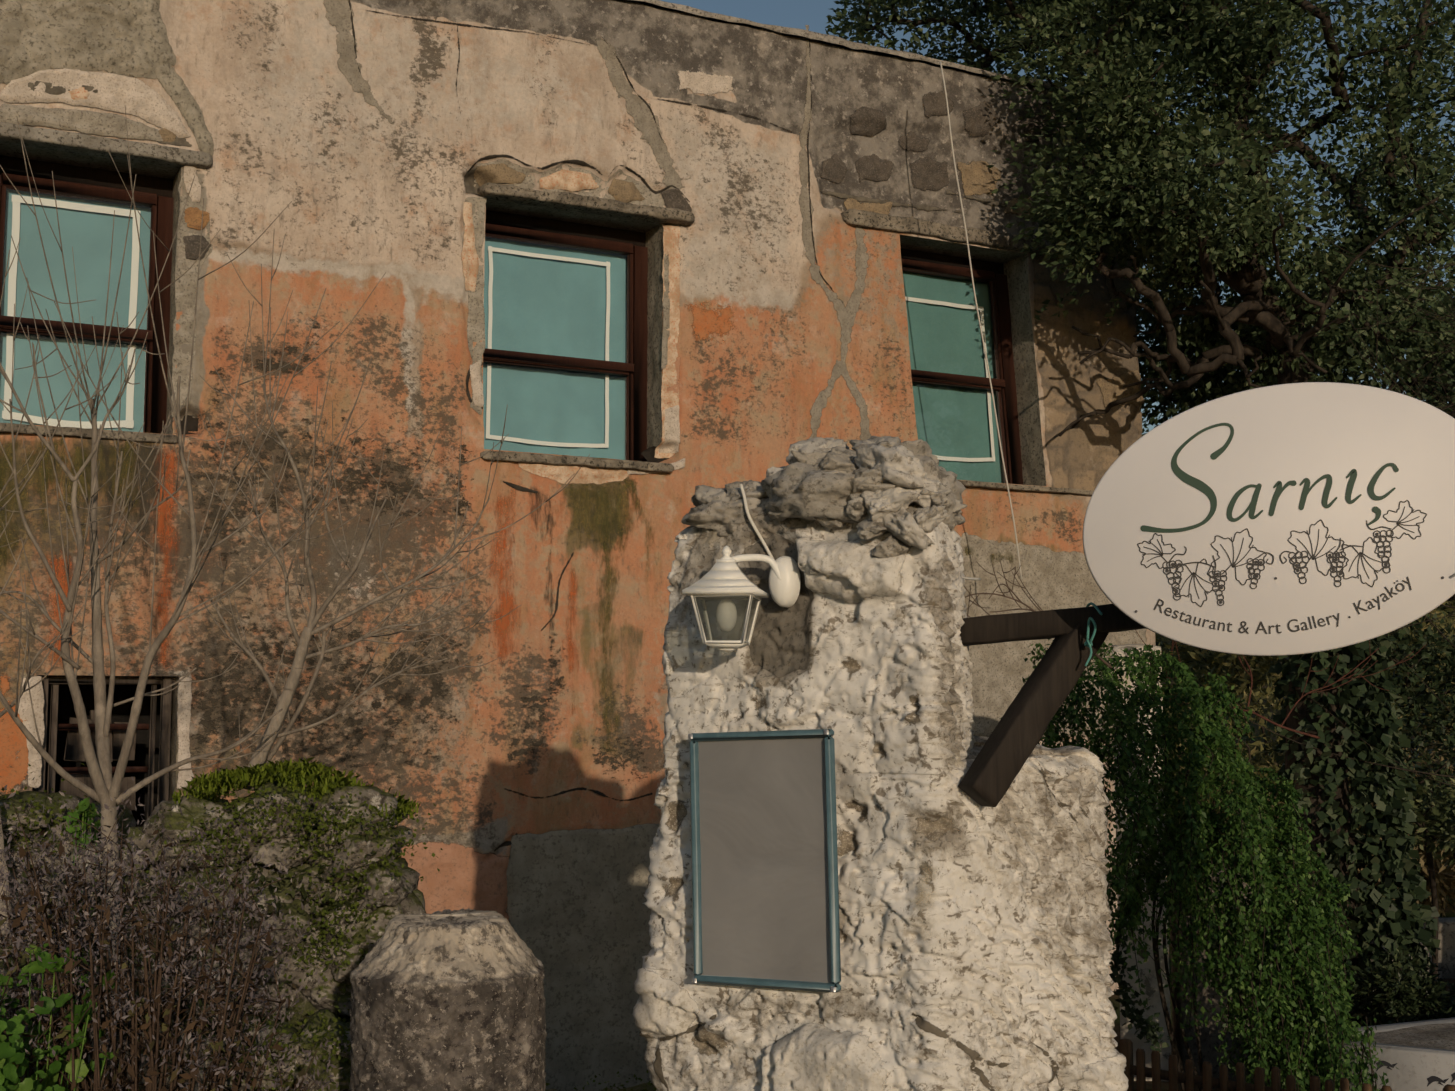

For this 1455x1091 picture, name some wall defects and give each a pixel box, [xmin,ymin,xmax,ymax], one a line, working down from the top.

flaking render [923,91,1001,137]
flaking render [820,102,1065,228]
crack [323,0,871,440]
water stain [245,316,320,383]
flaking render [1096,369,1144,407]
water stain [180,417,474,569]
crack [541,552,574,631]
water stain [599,543,617,653]
water stain [502,574,565,767]
crack [505,787,653,801]
crack [493,833,517,855]